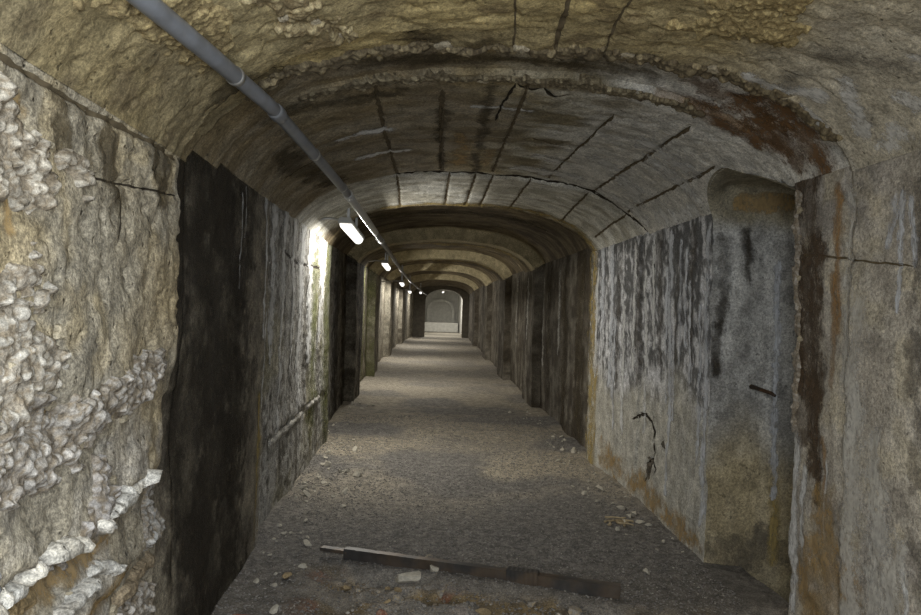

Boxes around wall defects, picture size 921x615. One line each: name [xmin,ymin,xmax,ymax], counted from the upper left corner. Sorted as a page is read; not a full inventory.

leakage [377,31,457,66]
crack [554,0,571,50]
leakage [51,92,72,151]
leakage [96,123,124,205]
crack [373,83,715,238]
crack [94,175,175,245]
crack [803,254,914,267]
leakage [154,144,364,615]
leakage [541,136,727,526]
rust [688,81,860,615]
rust [586,364,621,479]
crack [632,412,656,481]